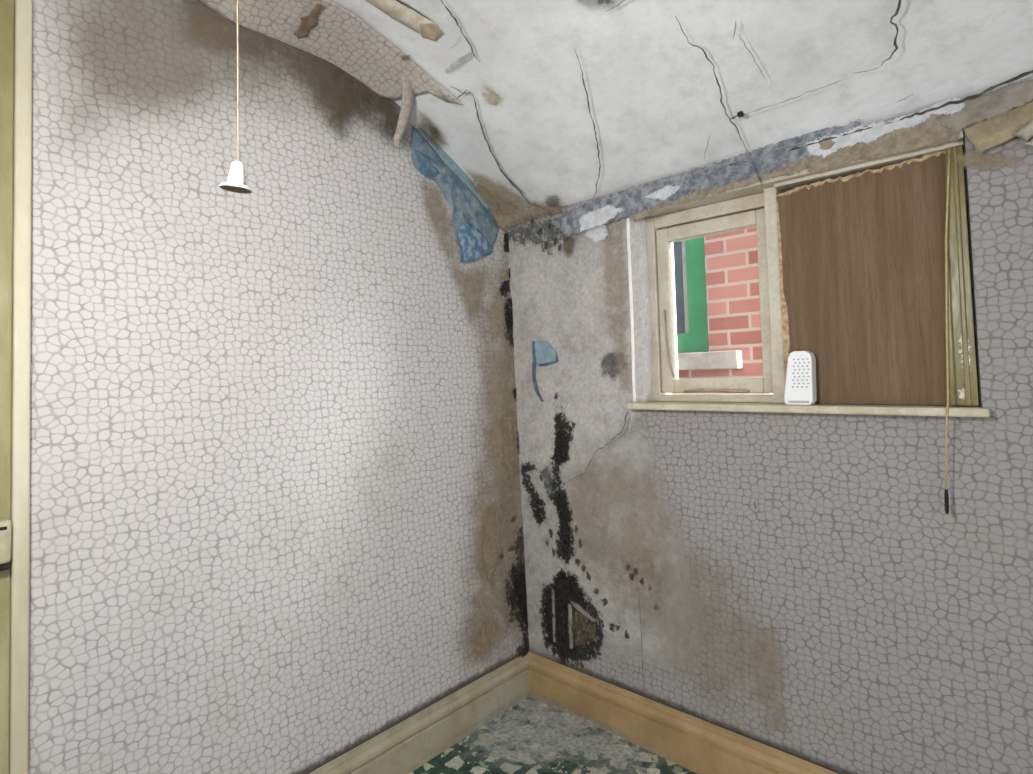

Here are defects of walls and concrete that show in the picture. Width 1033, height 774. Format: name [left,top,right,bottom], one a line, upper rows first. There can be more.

leakage [86,4,400,135]
peeling [410,126,499,262]
crack [441,0,480,62]
leakage [483,88,499,105]
crack [450,86,552,217]
crack [575,50,601,202]
flaking render [579,79,1033,232]
peeling [532,341,558,402]
leakage [424,174,693,668]